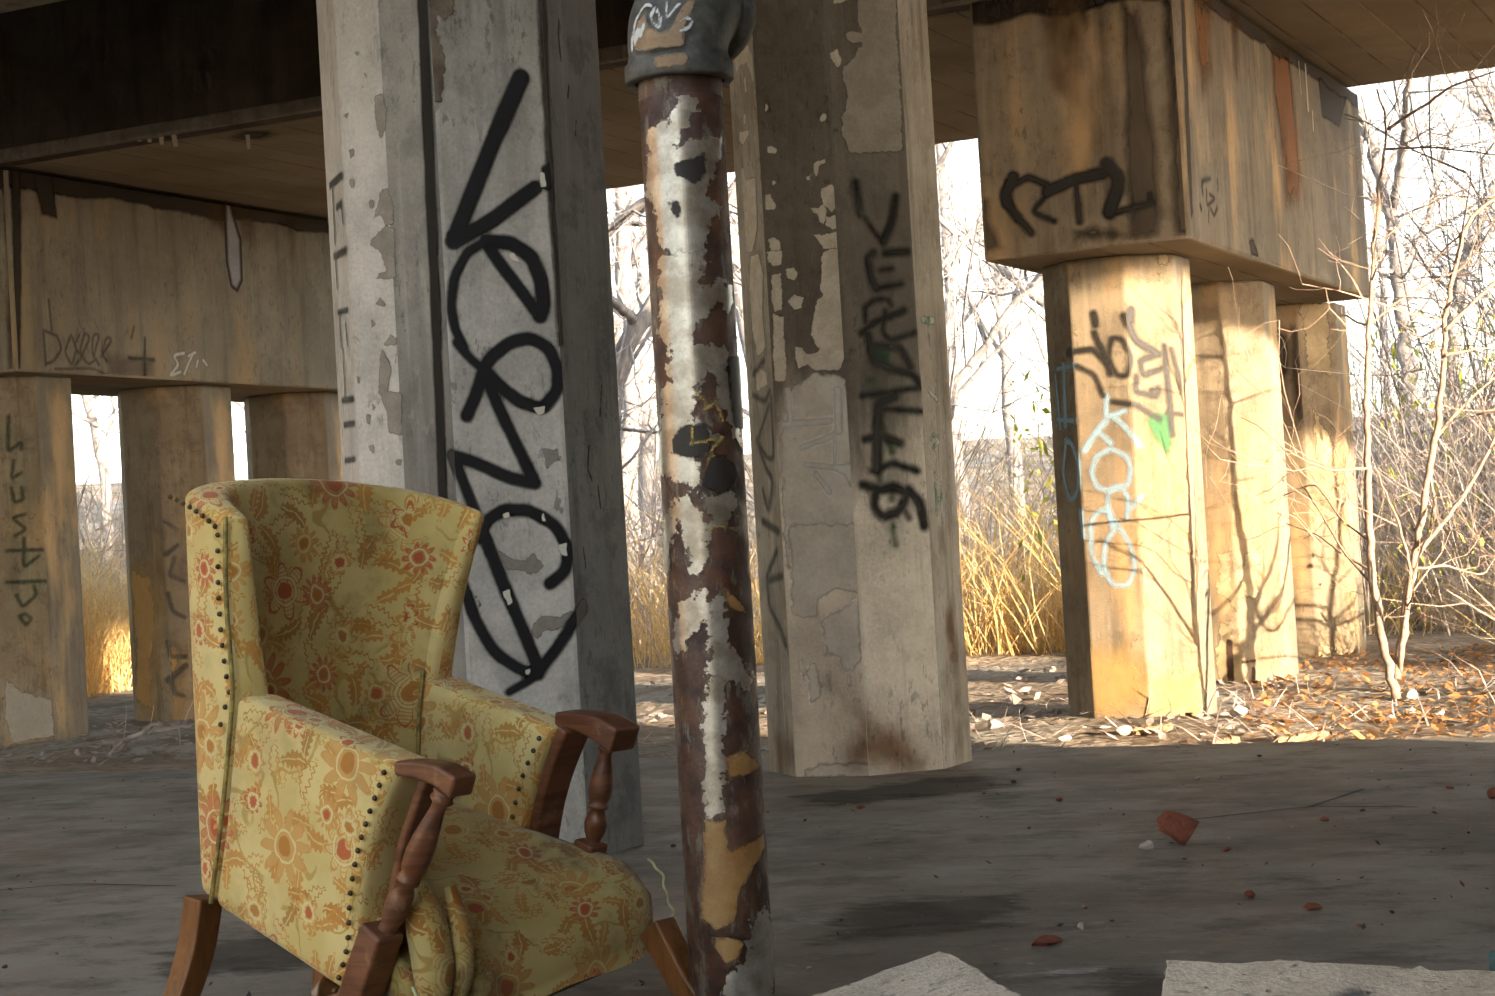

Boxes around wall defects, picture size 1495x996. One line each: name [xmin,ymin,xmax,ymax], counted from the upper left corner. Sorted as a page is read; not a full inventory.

peeling [735,45,754,92]
peeling [830,49,842,67]
corrosion [1194,0,1212,85]
peeling [374,94,387,138]
corrosion [1272,49,1299,202]
peeling [369,189,396,279]
peeling [366,335,402,435]
peeling [645,95,869,820]
peeling [715,902,775,996]